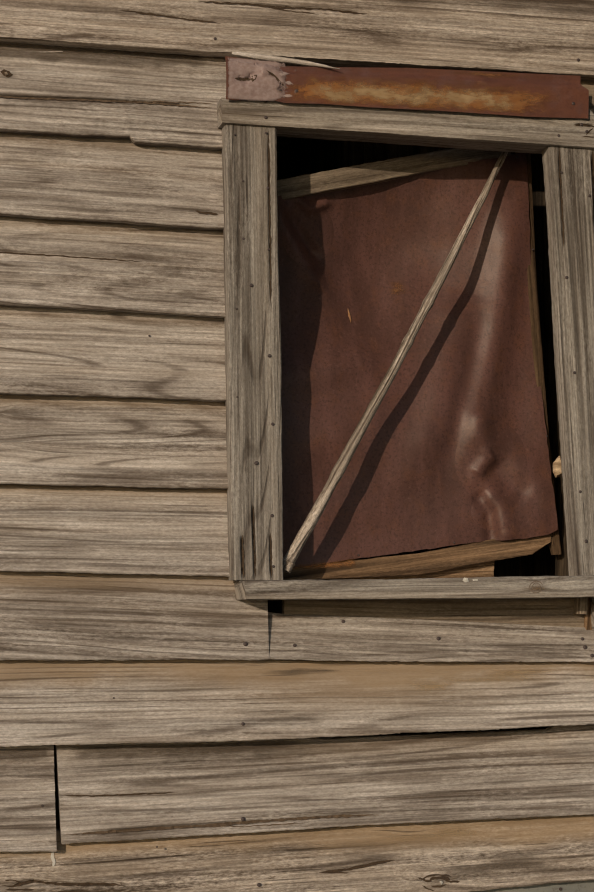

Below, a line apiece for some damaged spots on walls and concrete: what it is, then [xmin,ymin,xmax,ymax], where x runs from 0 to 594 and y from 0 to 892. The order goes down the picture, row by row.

peeling [228,58,294,101]
corrosion [296,80,541,111]